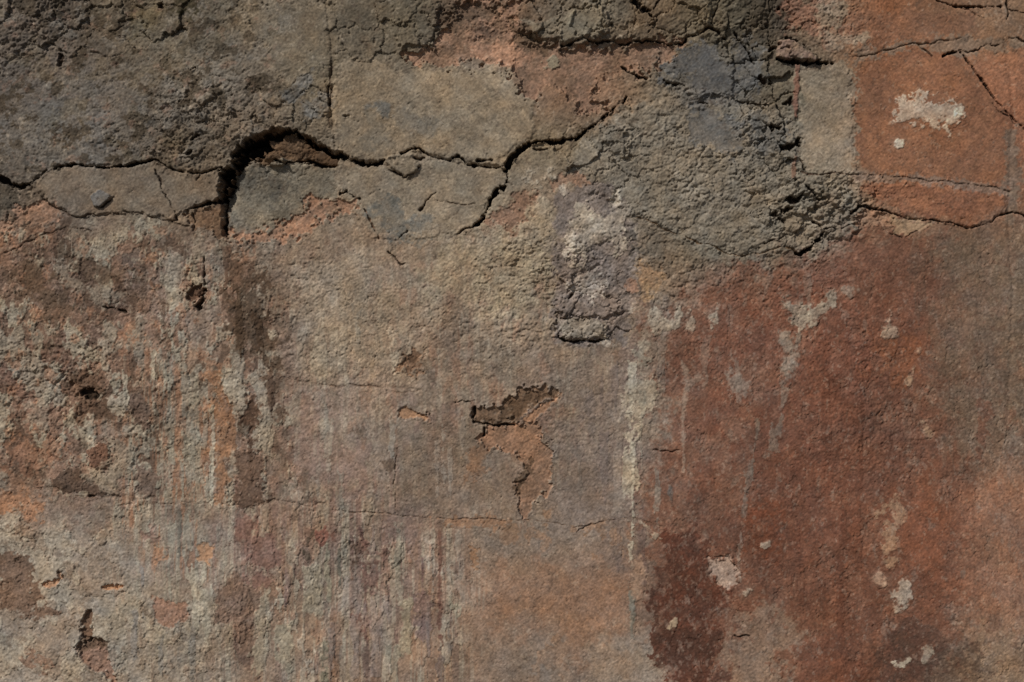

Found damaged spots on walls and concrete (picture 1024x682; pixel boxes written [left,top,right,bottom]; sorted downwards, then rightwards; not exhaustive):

crack [0,0,1024,266]
flaking render [459,383,564,519]
damp [569,328,802,682]